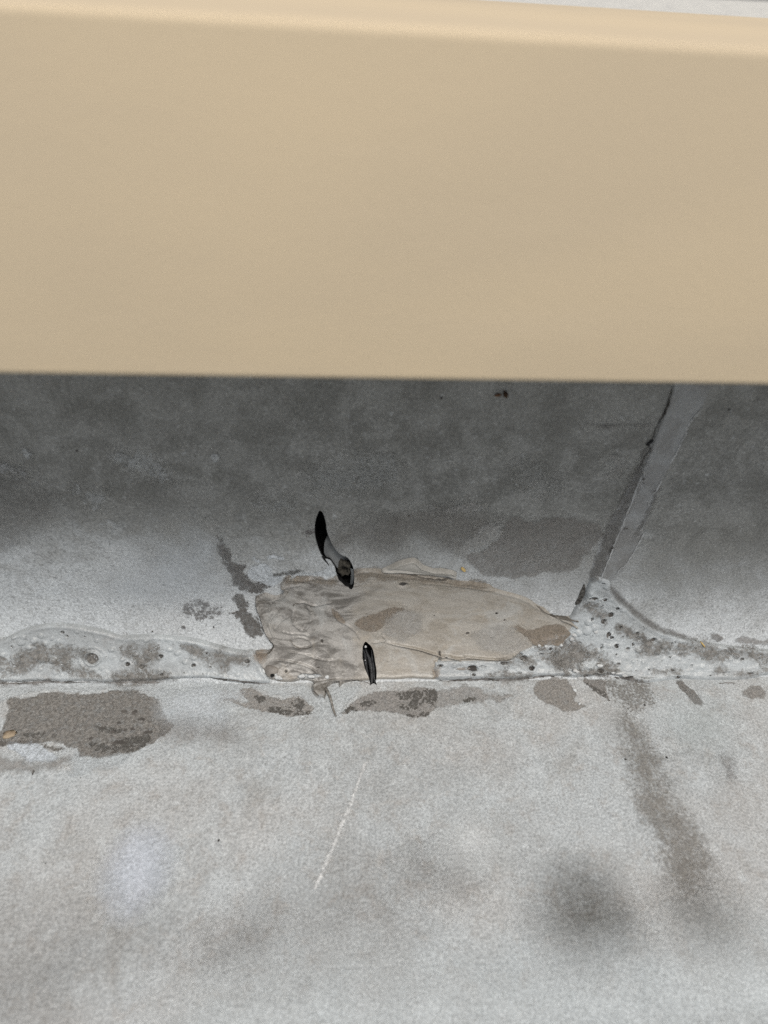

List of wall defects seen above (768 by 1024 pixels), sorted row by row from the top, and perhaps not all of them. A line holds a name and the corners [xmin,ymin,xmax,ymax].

crack [636,389,672,474]
crack [575,585,585,605]